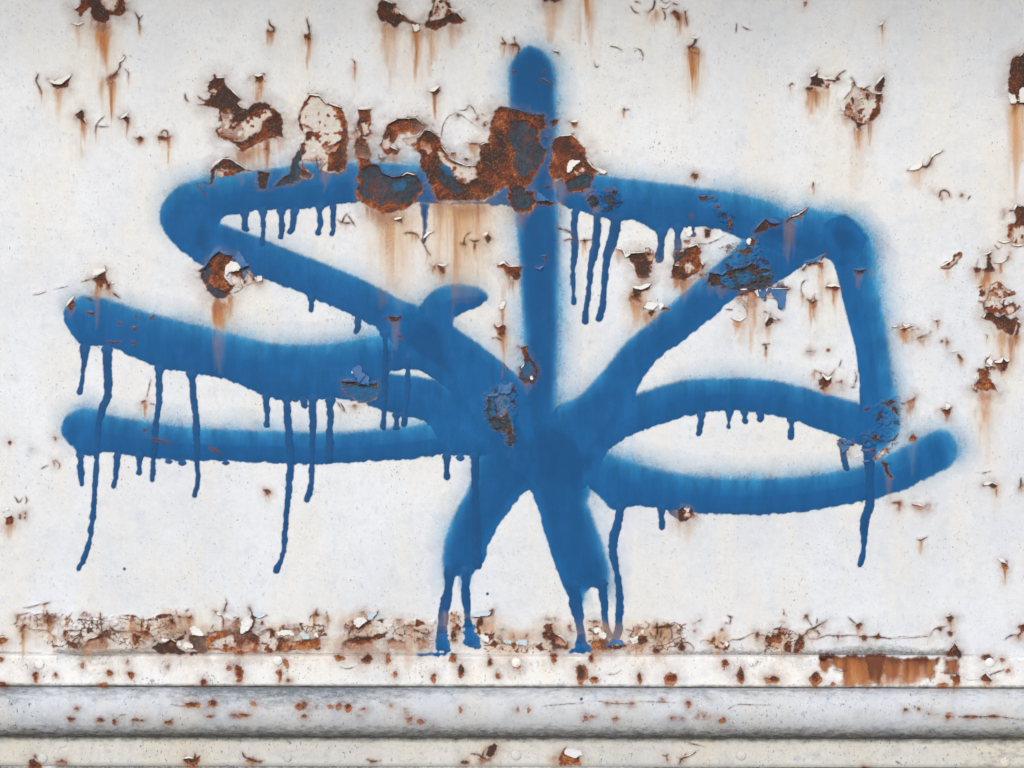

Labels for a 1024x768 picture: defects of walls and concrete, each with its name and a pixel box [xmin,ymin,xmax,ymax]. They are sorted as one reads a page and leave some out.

corrosion [73,0,126,63]
corrosion [376,0,465,70]
corrosion [199,74,283,195]
peeling [429,85,486,130]
corrosion [1008,53,1024,166]
corrosion [353,106,607,234]
peeling [587,188,620,211]
peeling [338,365,378,410]
peeling [484,346,538,447]
peeling [837,397,917,478]
corrosion [152,617,260,682]
corrosion [809,642,1010,688]